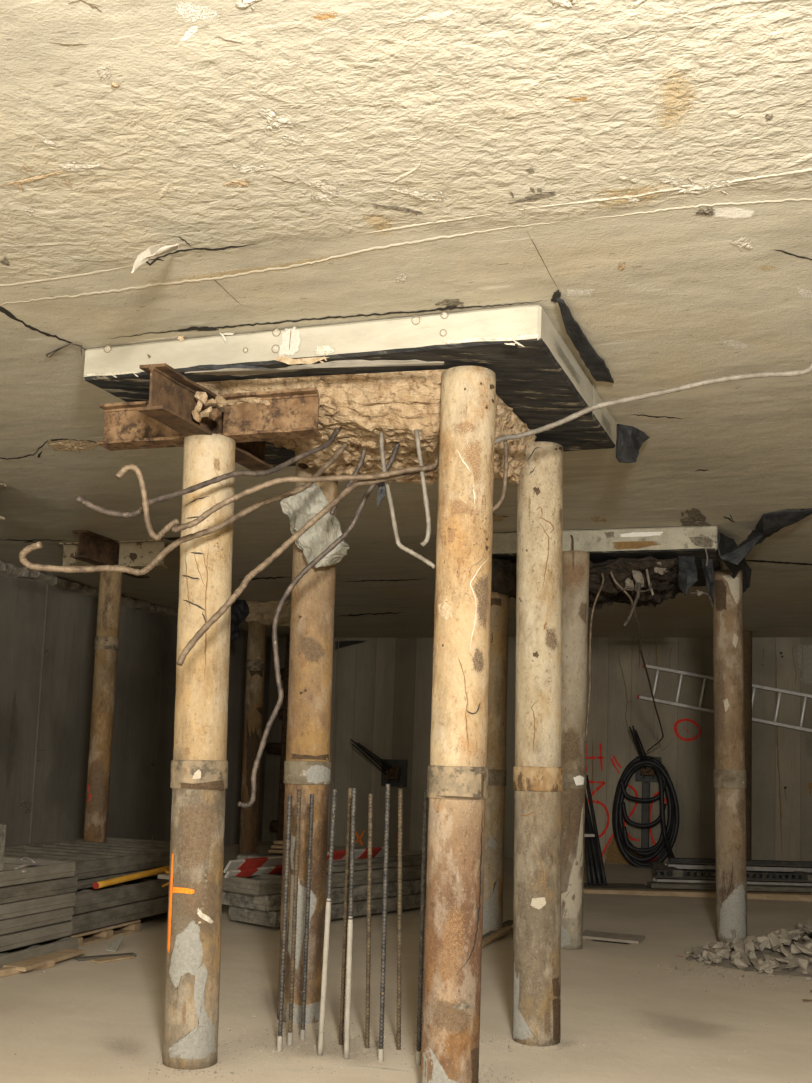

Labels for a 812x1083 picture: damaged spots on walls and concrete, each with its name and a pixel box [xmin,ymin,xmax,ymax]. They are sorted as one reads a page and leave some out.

crack [68,0,102,12]
crack [0,306,86,354]
crack [0,439,97,460]